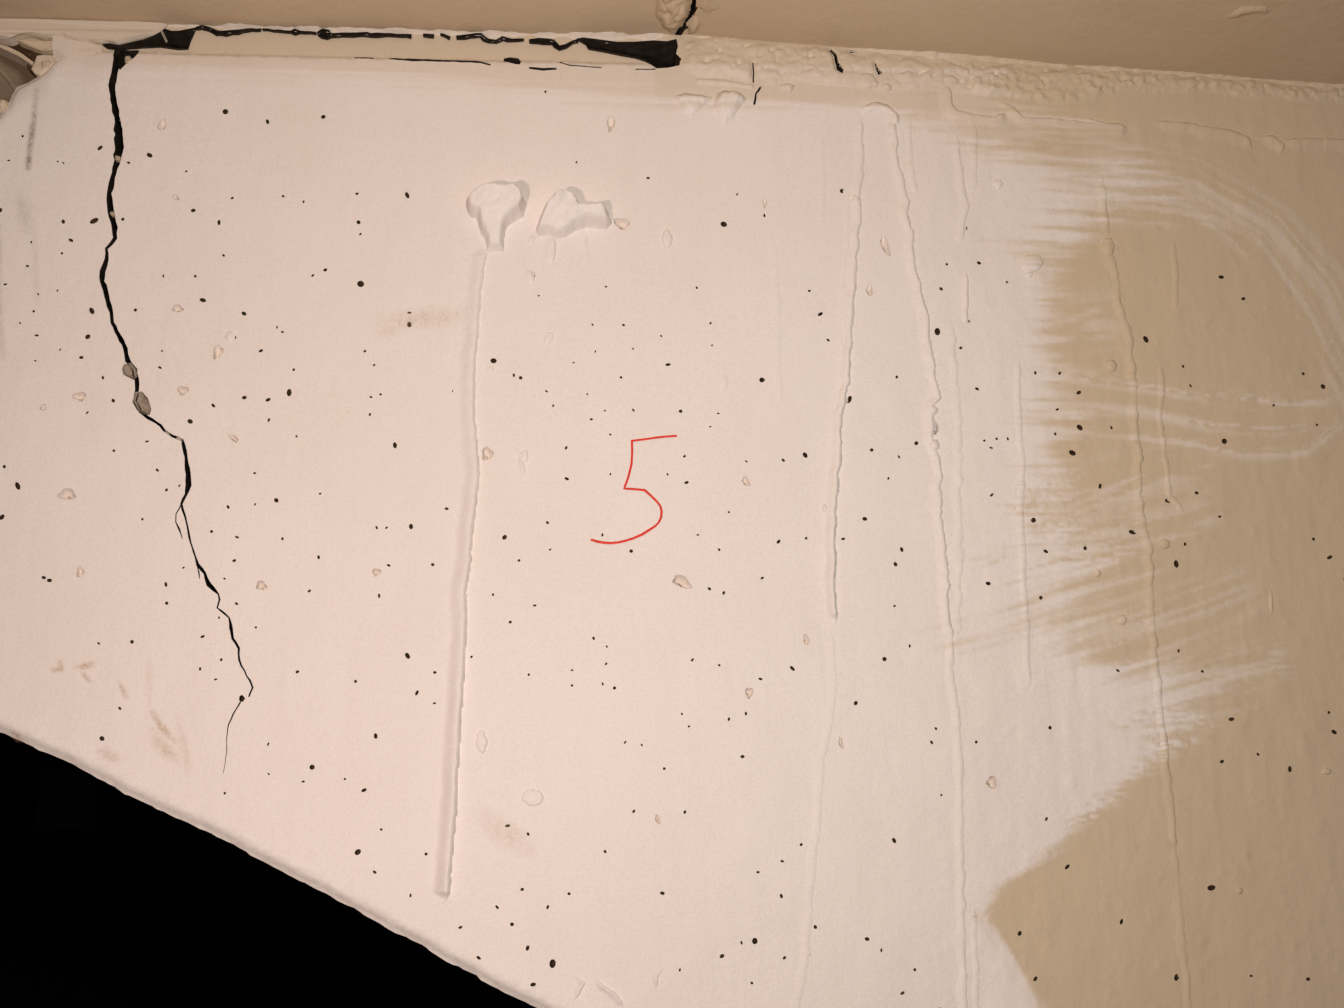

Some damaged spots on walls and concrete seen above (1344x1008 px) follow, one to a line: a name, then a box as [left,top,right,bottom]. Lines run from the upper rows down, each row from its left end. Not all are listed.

crack [99,0,719,773]